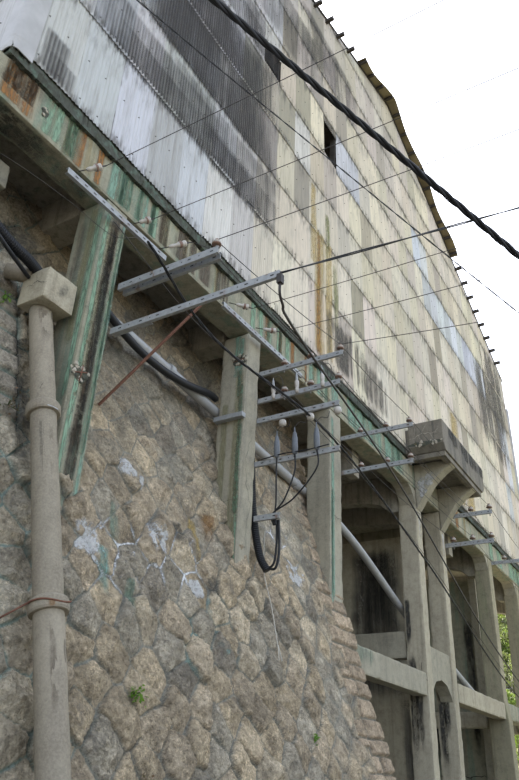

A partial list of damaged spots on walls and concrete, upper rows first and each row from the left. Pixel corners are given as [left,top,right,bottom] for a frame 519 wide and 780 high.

rust [1,59,39,116]
water stain [116,5,184,110]
water stain [154,0,273,146]
water stain [108,163,168,247]
water stain [176,229,197,260]
water stain [191,266,229,304]
water stain [75,519,139,586]
water stain [146,519,219,598]